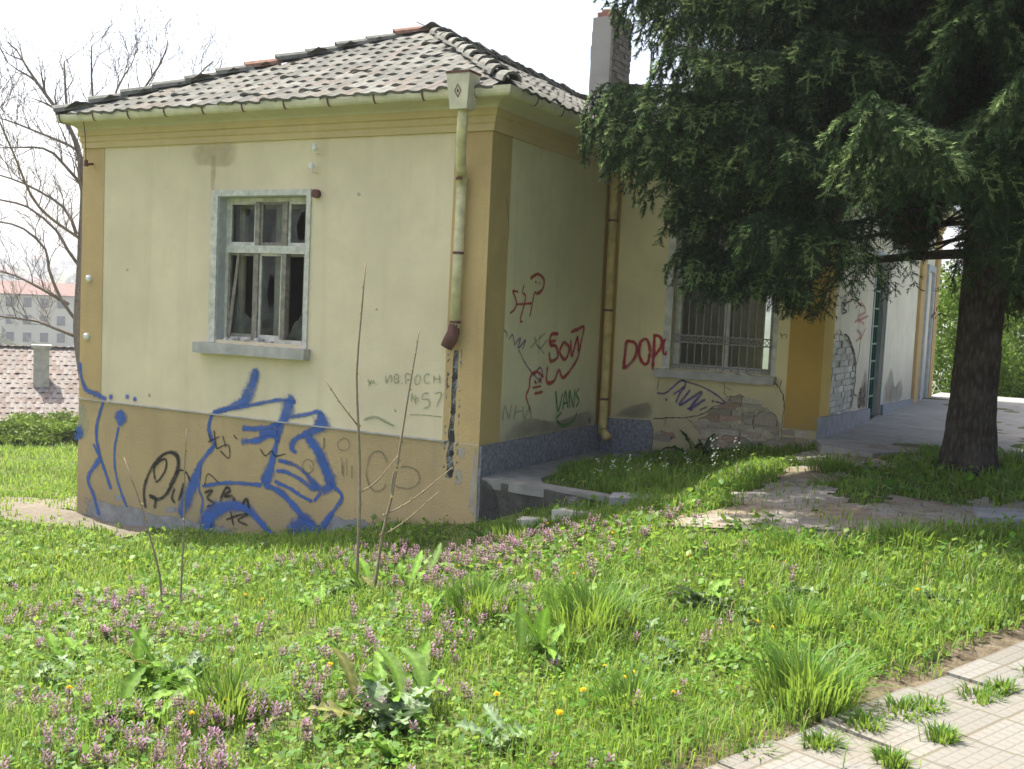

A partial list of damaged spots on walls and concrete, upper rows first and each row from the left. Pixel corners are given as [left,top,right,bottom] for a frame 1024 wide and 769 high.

spalling [829,329,867,415]
spalling [692,394,816,453]